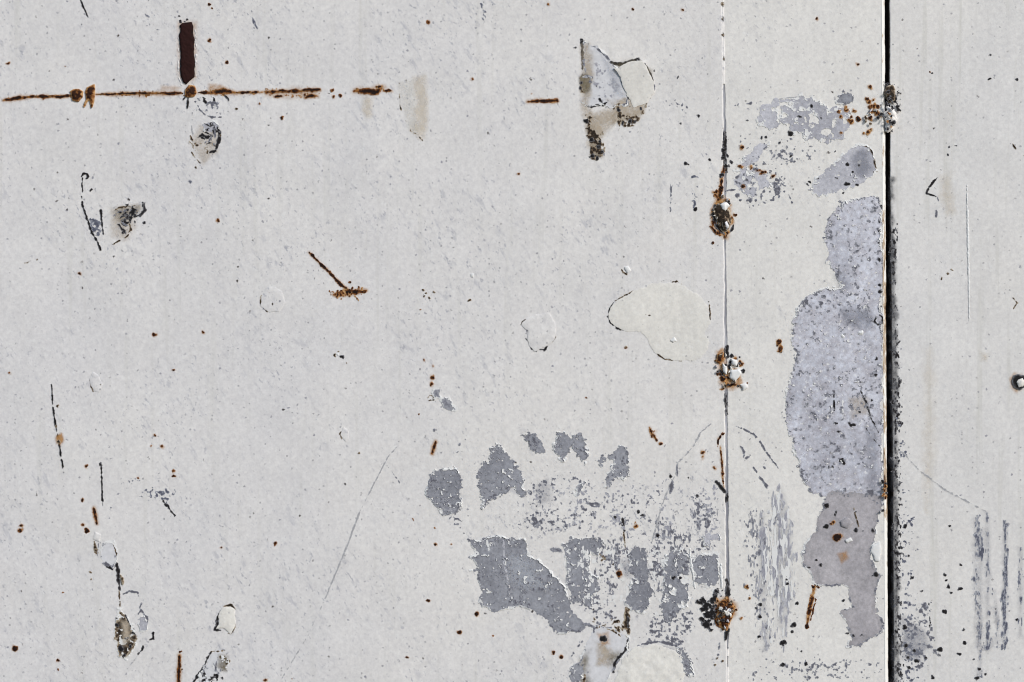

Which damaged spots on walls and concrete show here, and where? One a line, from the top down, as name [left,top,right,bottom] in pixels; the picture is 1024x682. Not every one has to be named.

corrosion [3,15,392,112]
peeling [190,97,222,169]
peeling [574,38,655,161]
peeling [81,172,147,251]
corrosion [710,167,737,244]
corrosion [309,252,367,301]
corrosion [714,345,748,415]
peeling [726,89,886,681]
peeling [93,532,155,664]
peeling [425,431,723,677]
corrosion [696,578,743,666]
corrosion [805,584,820,629]